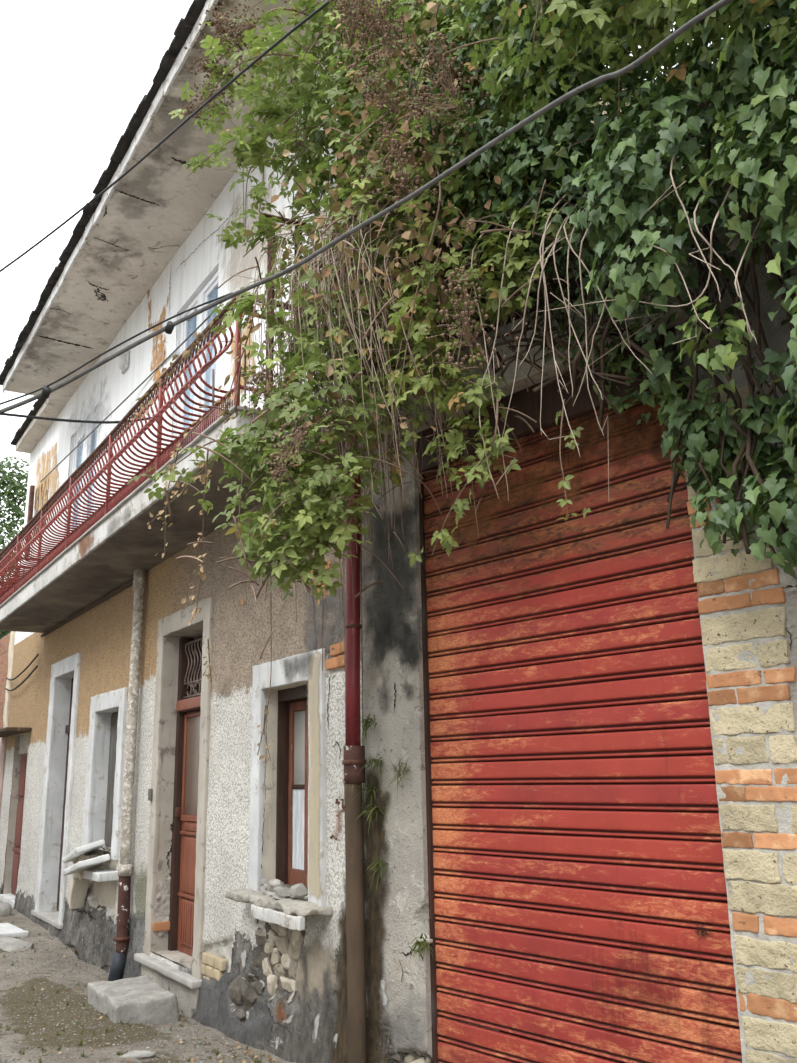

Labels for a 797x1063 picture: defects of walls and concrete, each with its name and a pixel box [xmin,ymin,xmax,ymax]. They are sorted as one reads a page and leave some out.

peeling [147,291,168,389]
peeling [34,443,58,519]
damp [366,504,423,665]
flaking render [201,935,233,981]
spalling [390,1047,433,1063]